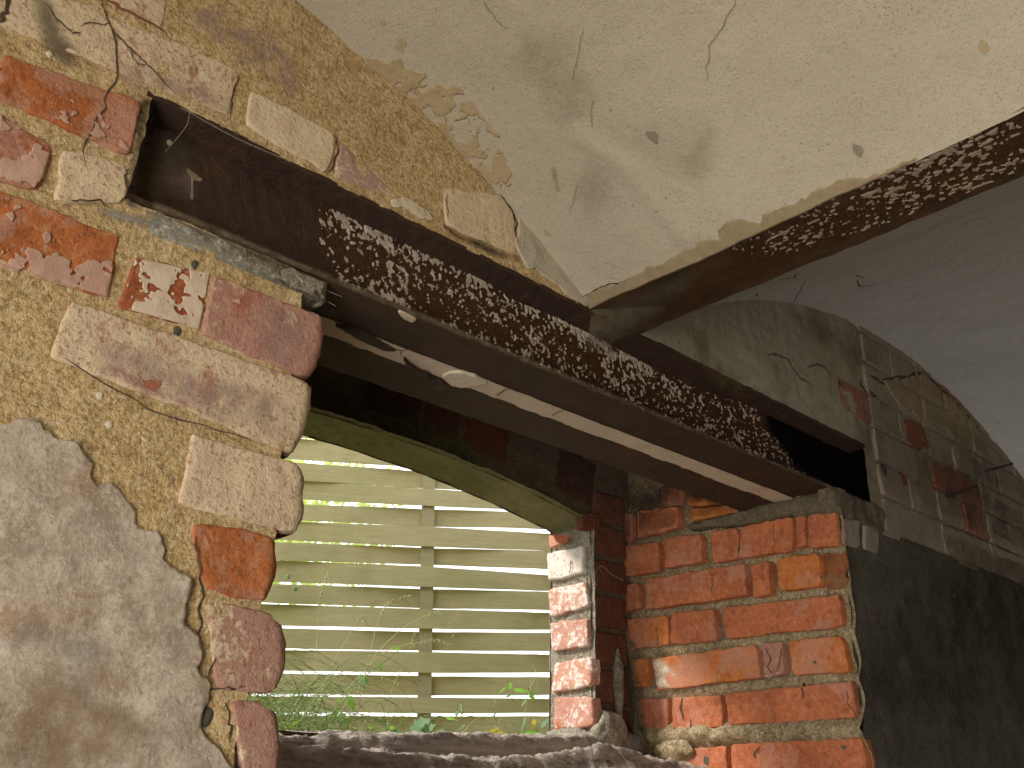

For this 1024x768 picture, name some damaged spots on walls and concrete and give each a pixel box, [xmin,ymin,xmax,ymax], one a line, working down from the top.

crack [705,0,736,80]
crack [46,0,175,169]
flaking render [365,39,512,188]
peeling [0,143,50,187]
peeling [0,231,113,297]
peeling [127,259,209,329]
rust [335,322,451,388]
rust [398,310,416,323]
crack [768,353,832,386]
flaking render [0,417,233,768]
crack [194,535,205,635]
crack [208,658,245,741]